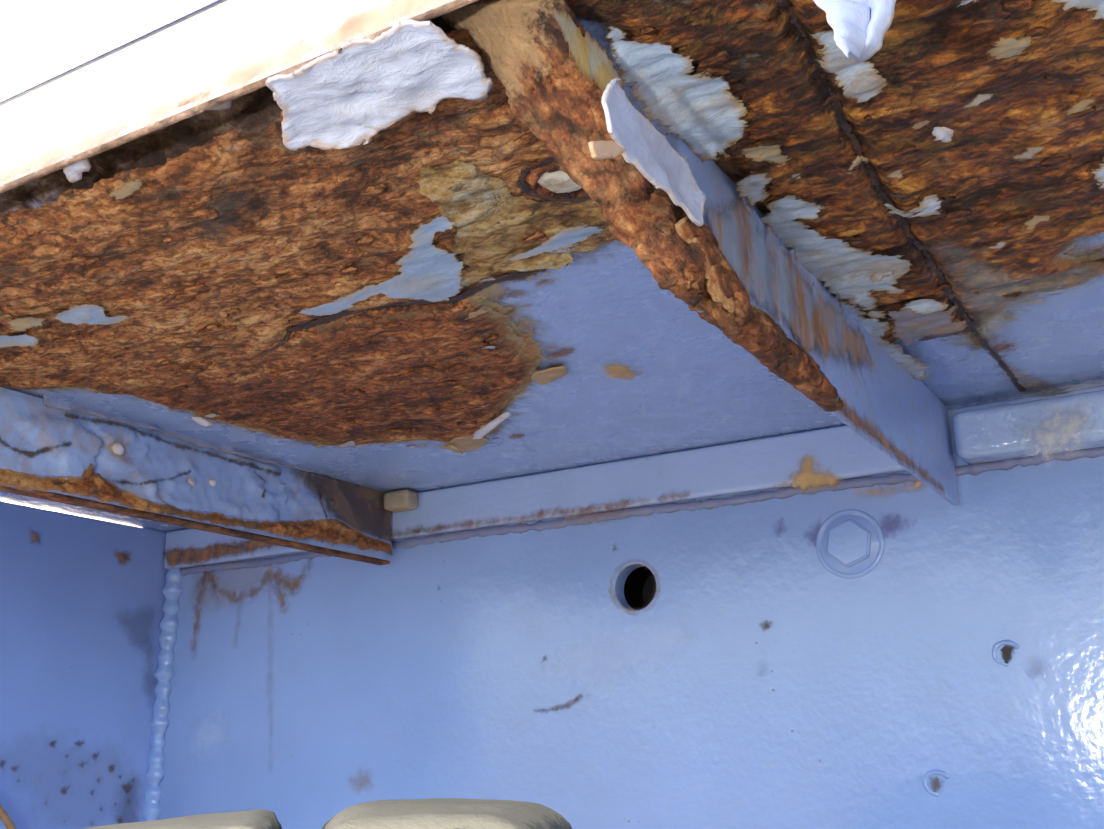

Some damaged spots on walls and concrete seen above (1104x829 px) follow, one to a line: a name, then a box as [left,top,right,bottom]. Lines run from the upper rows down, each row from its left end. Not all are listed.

peeling [1051,0,1104,19]
peeling [932,127,954,143]
peeling [63,155,91,183]
peeling [1090,159,1104,188]
peeling [550,0,948,381]
rust [0,0,1104,492]
peeling [445,436,489,454]
rust [0,463,446,632]